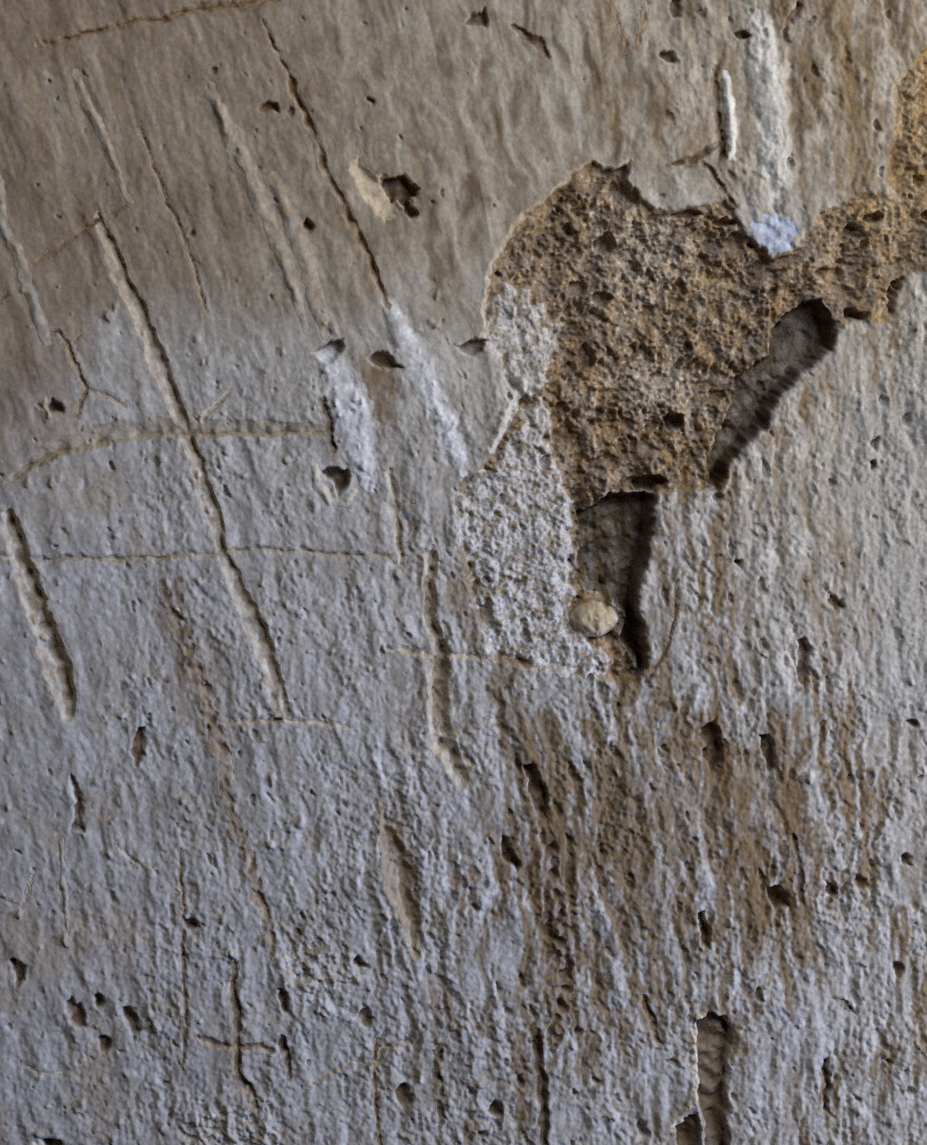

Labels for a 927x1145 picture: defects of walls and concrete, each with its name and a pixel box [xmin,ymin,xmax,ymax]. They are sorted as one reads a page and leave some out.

flaking render [464,7,488,28]
flaking render [785,0,803,25]
flaking render [510,23,551,60]
flaking render [732,28,751,40]
flaking render [452,44,927,691]